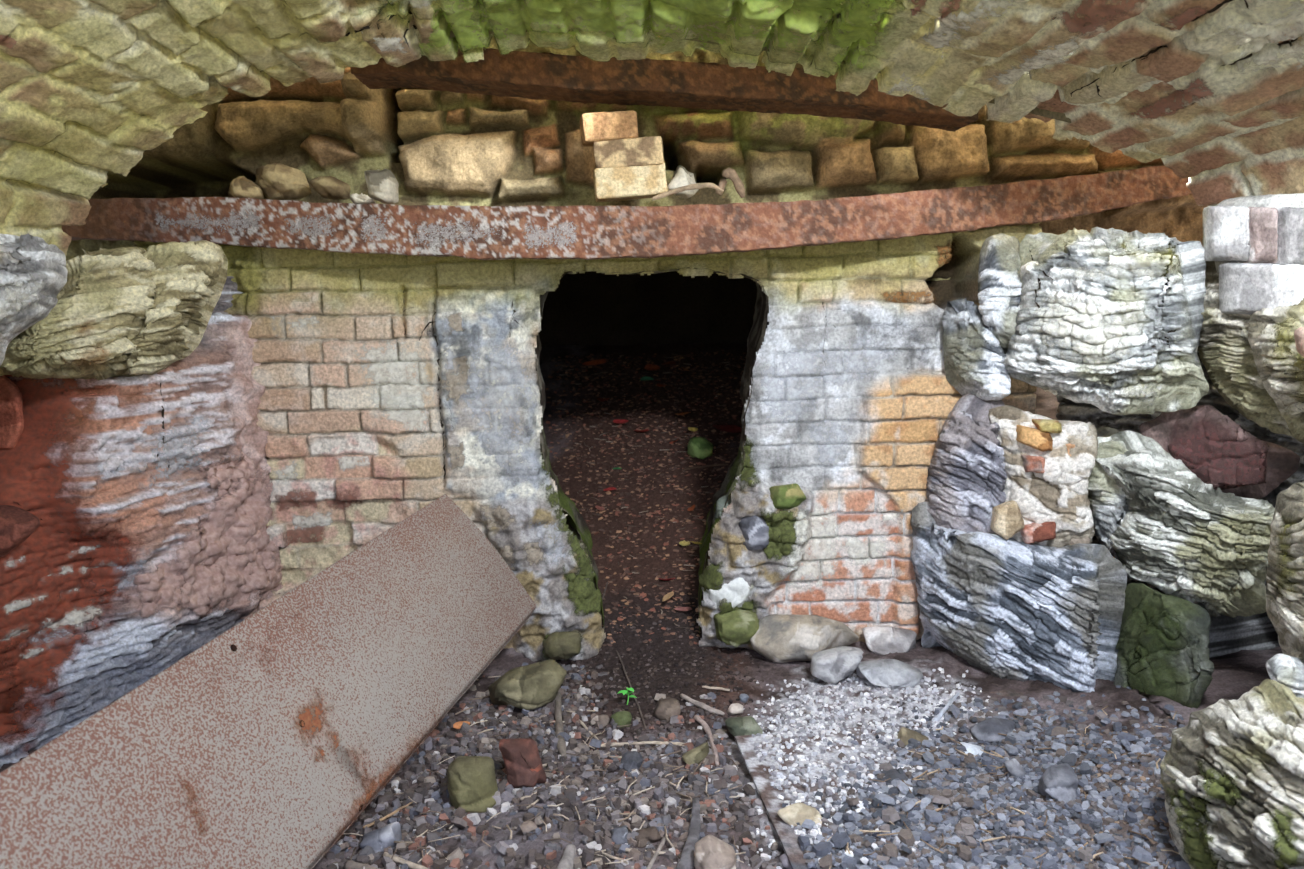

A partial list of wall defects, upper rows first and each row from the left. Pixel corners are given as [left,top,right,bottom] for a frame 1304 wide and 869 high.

leakage [361,31,402,50]
leakage [386,0,492,54]
leakage [828,0,893,71]